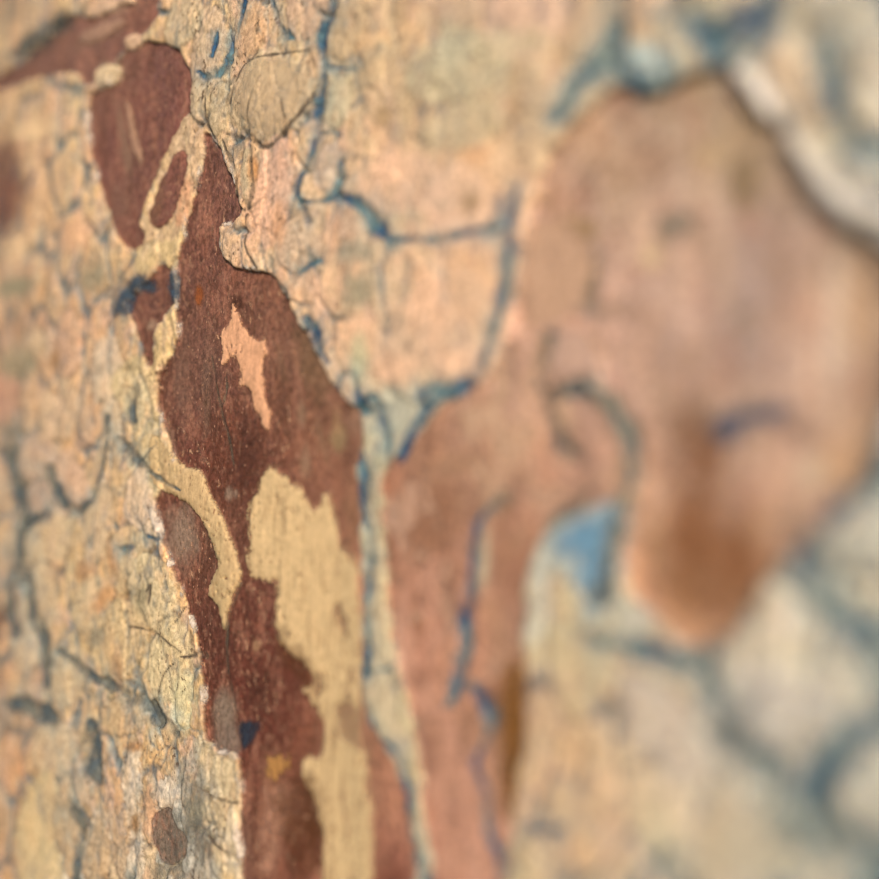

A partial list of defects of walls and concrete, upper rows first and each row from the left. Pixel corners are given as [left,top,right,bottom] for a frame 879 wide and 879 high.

peeling [0,0,192,250]
crack [190,0,519,465]
crack [549,17,670,122]
crack [71,804,88,879]
crack [83,718,103,786]
crack [1,445,197,735]
crack [98,400,181,491]
peeling [122,132,417,879]
crack [443,502,502,869]
crack [536,330,644,607]
peeling [382,67,879,879]
crack [719,461,879,879]